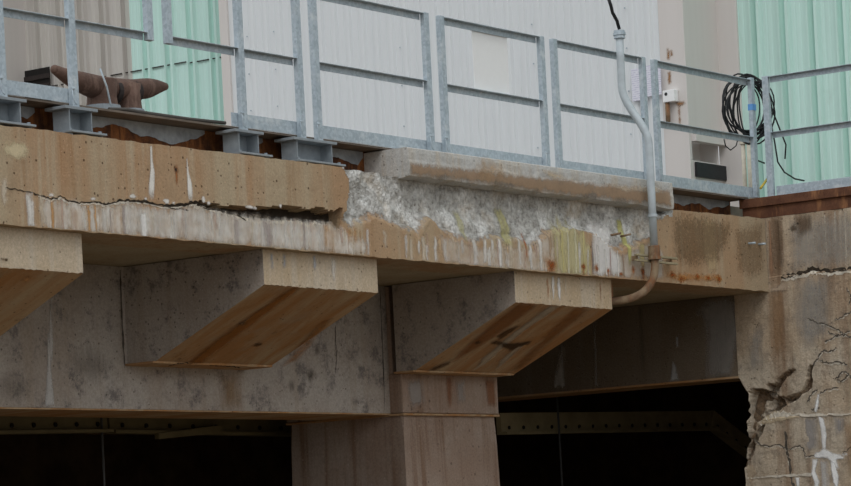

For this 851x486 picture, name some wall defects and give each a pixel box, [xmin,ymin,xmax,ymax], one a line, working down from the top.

crack [6,187,331,233]
water stain [26,162,369,276]
spalling [332,148,729,249]
crack [781,266,851,412]
crack [756,432,815,486]
water stain [805,395,847,486]